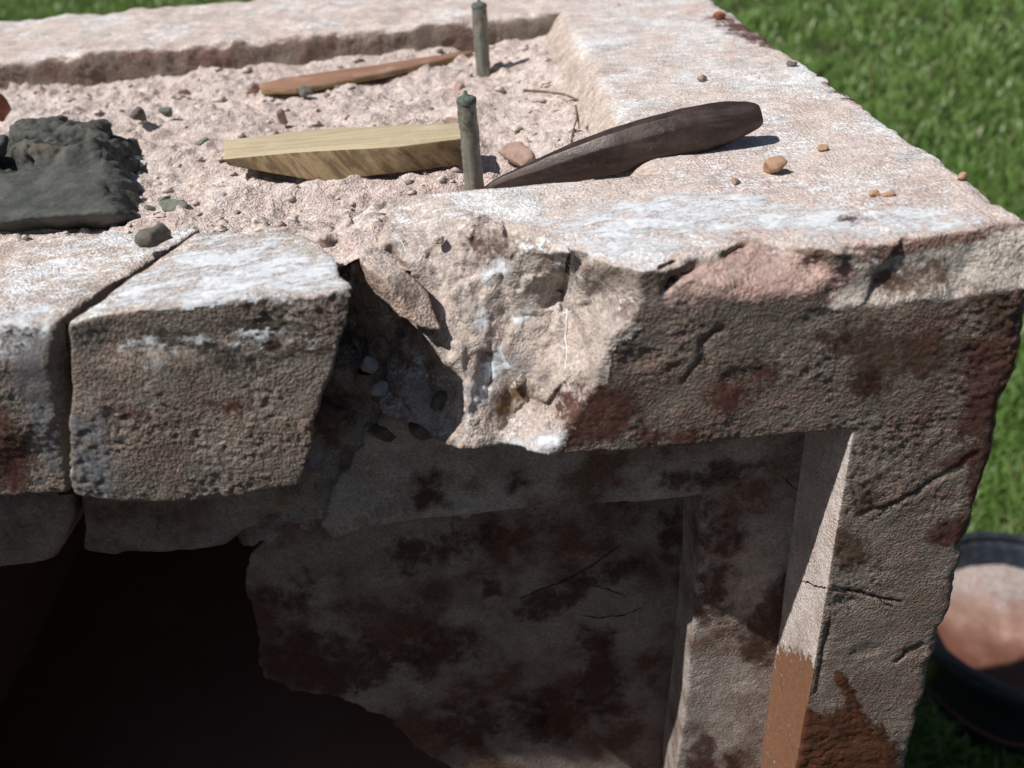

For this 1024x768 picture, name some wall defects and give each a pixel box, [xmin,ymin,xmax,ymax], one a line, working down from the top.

spalling [360,194,643,455]
rust [555,378,698,448]
rust [703,357,779,420]
rust [814,292,1023,546]
leakage [414,472,444,511]
crack [862,466,956,520]
leakage [514,557,645,621]
crack [520,545,643,618]
leakage [659,461,764,626]
crack [799,580,896,606]
rust [833,529,871,572]
leakage [259,571,478,695]